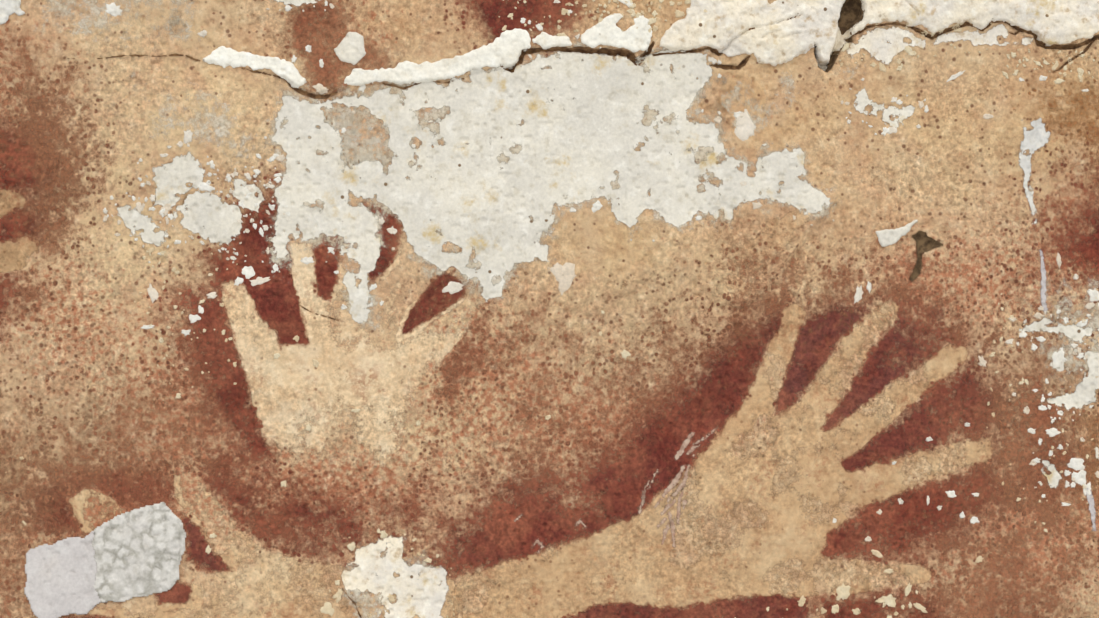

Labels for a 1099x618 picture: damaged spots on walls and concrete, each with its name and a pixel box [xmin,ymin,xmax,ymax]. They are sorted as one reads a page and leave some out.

spalling [0,0,25,25]
spalling [105,2,123,17]
spalling [266,0,335,12]
peeling [498,0,691,39]
crack [500,41,750,73]
crack [852,21,1099,72]
spalling [103,47,834,376]
spalling [876,220,943,281]
spalling [320,528,456,618]